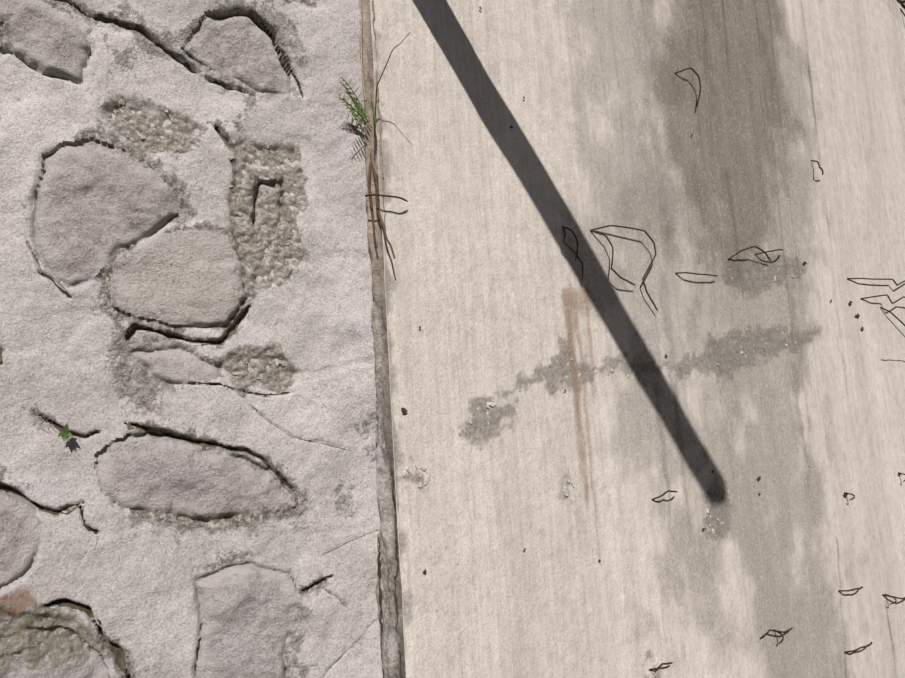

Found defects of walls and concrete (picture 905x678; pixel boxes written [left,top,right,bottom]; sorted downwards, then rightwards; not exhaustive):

crack [26,240,72,298]
leakage [599,0,815,544]
crack [111,308,247,346]
crack [36,414,100,438]
crack [124,422,295,491]
crack [191,382,351,451]
crack [289,424,403,678]
crack [45,599,129,678]